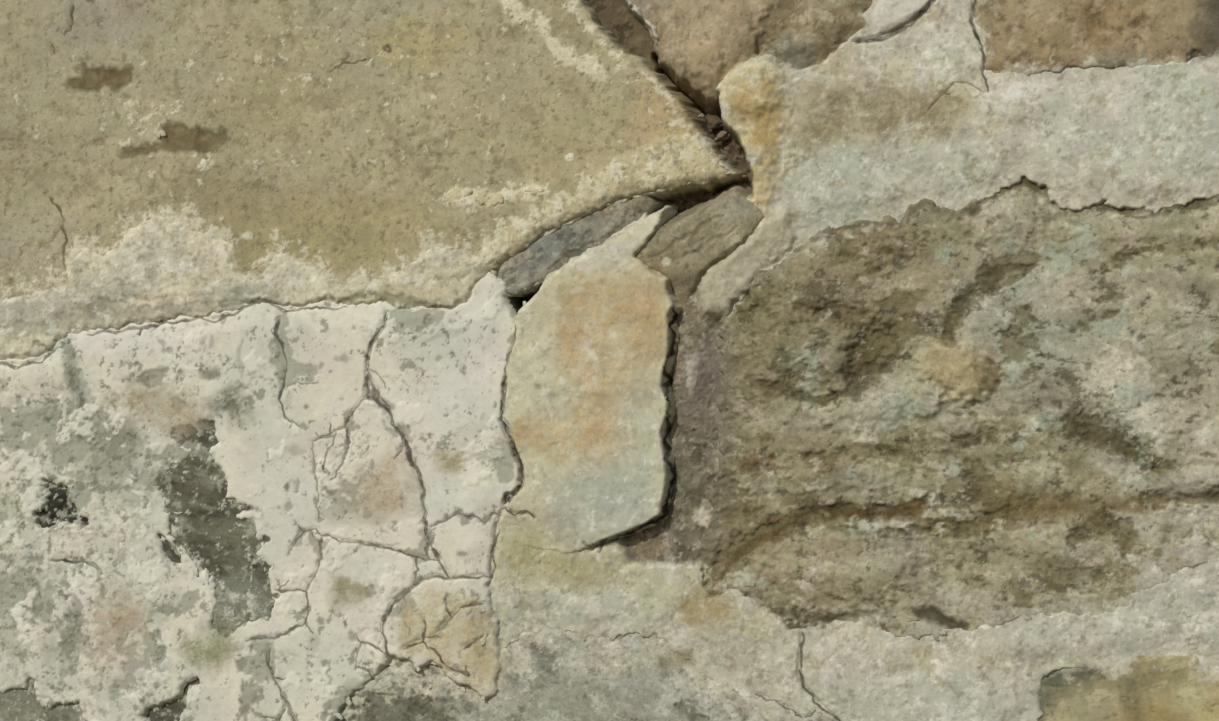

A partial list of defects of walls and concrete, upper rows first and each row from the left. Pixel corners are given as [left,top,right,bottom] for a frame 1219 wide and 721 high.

crack [853,0,932,42]
crack [926,0,988,111]
crack [584,307,677,553]
flaking render [37,480,89,531]
flaking render [153,419,280,638]
crack [0,299,534,721]
flaking render [0,678,87,721]
flaking render [147,679,200,721]
crack [755,631,840,721]